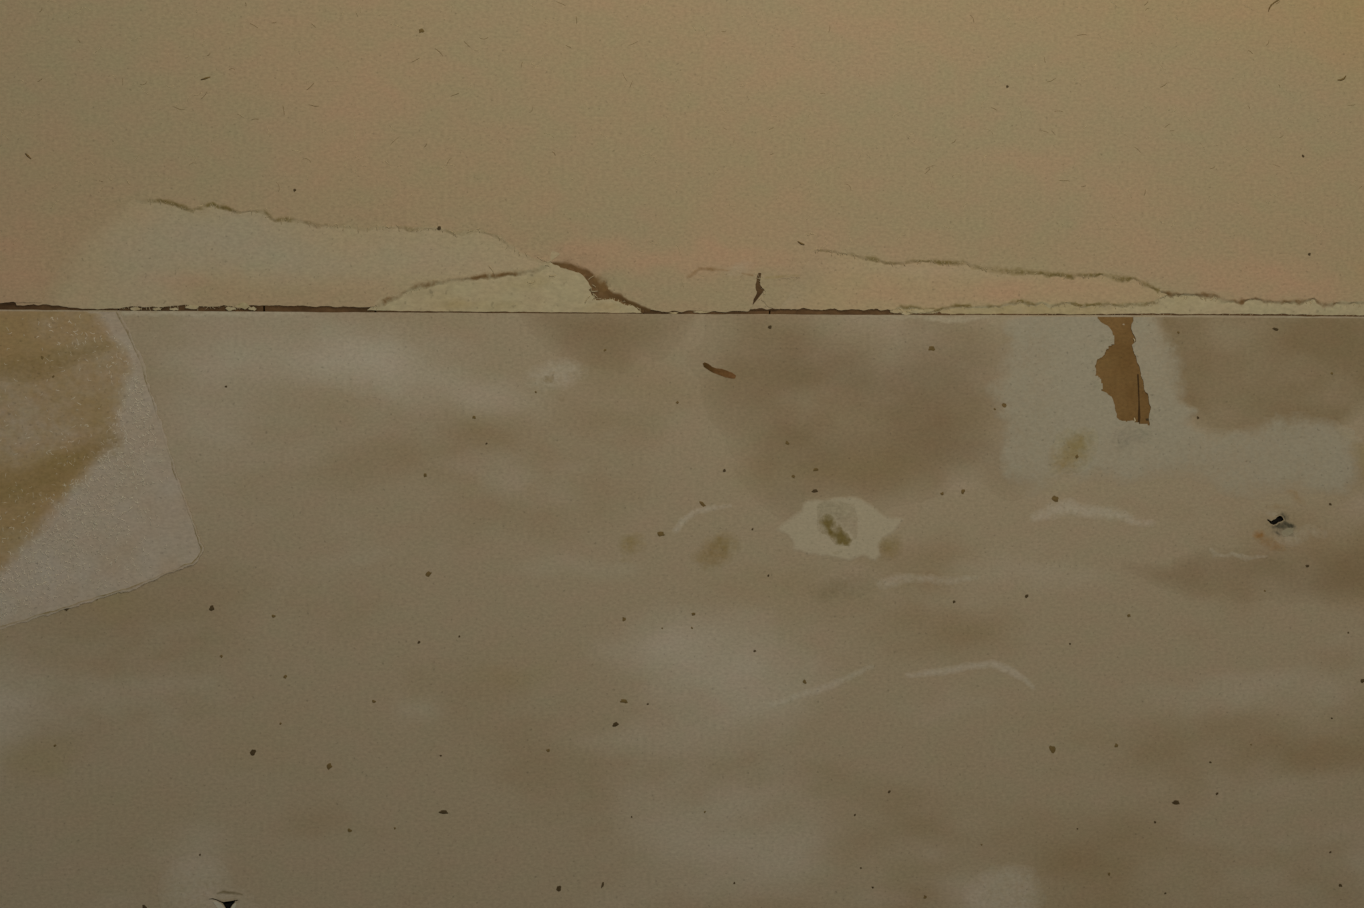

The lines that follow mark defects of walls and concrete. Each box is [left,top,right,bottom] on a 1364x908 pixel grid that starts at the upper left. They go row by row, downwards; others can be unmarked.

peeling [16,196,560,311]
water stain [518,313,1027,521]
peeling [751,246,1166,425]
water stain [1161,317,1364,430]
spalling [775,493,905,562]
water stain [1121,545,1364,606]